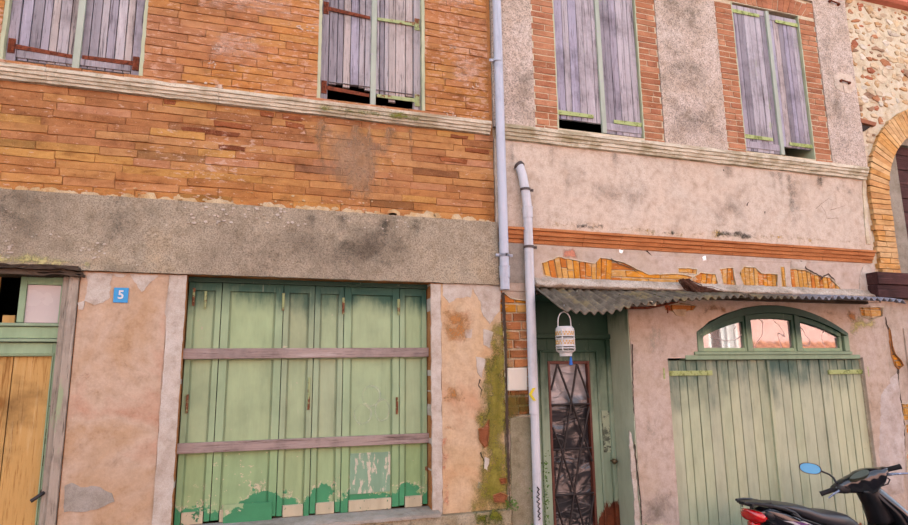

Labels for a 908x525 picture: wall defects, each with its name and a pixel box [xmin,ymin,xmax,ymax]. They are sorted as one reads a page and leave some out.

peeling [78,273,159,310]
spalling [541,249,841,290]
flaking render [443,283,530,420]
spalling [888,328,904,369]
spalling [478,420,490,471]
peeling [628,430,640,525]